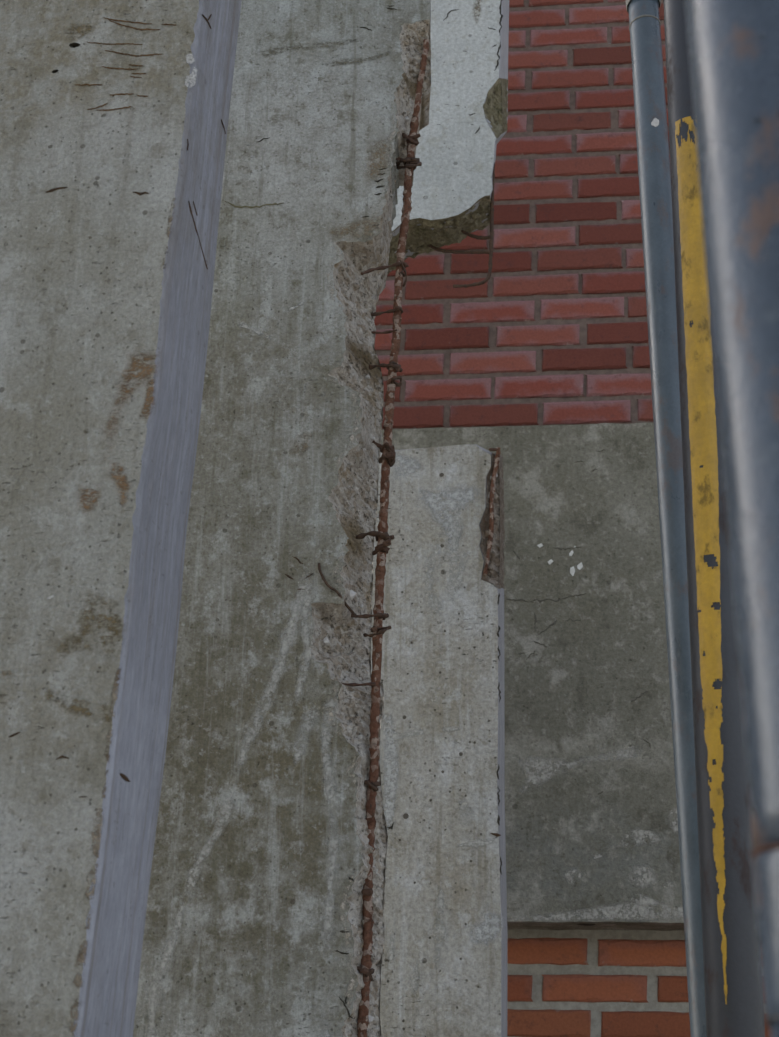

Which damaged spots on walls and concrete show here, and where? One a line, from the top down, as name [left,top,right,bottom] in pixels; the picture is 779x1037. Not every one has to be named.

spalling [483,78,508,138]
corrosion [116,354,155,417]
corrosion [112,463,128,502]
spalling [307,19,491,1037]